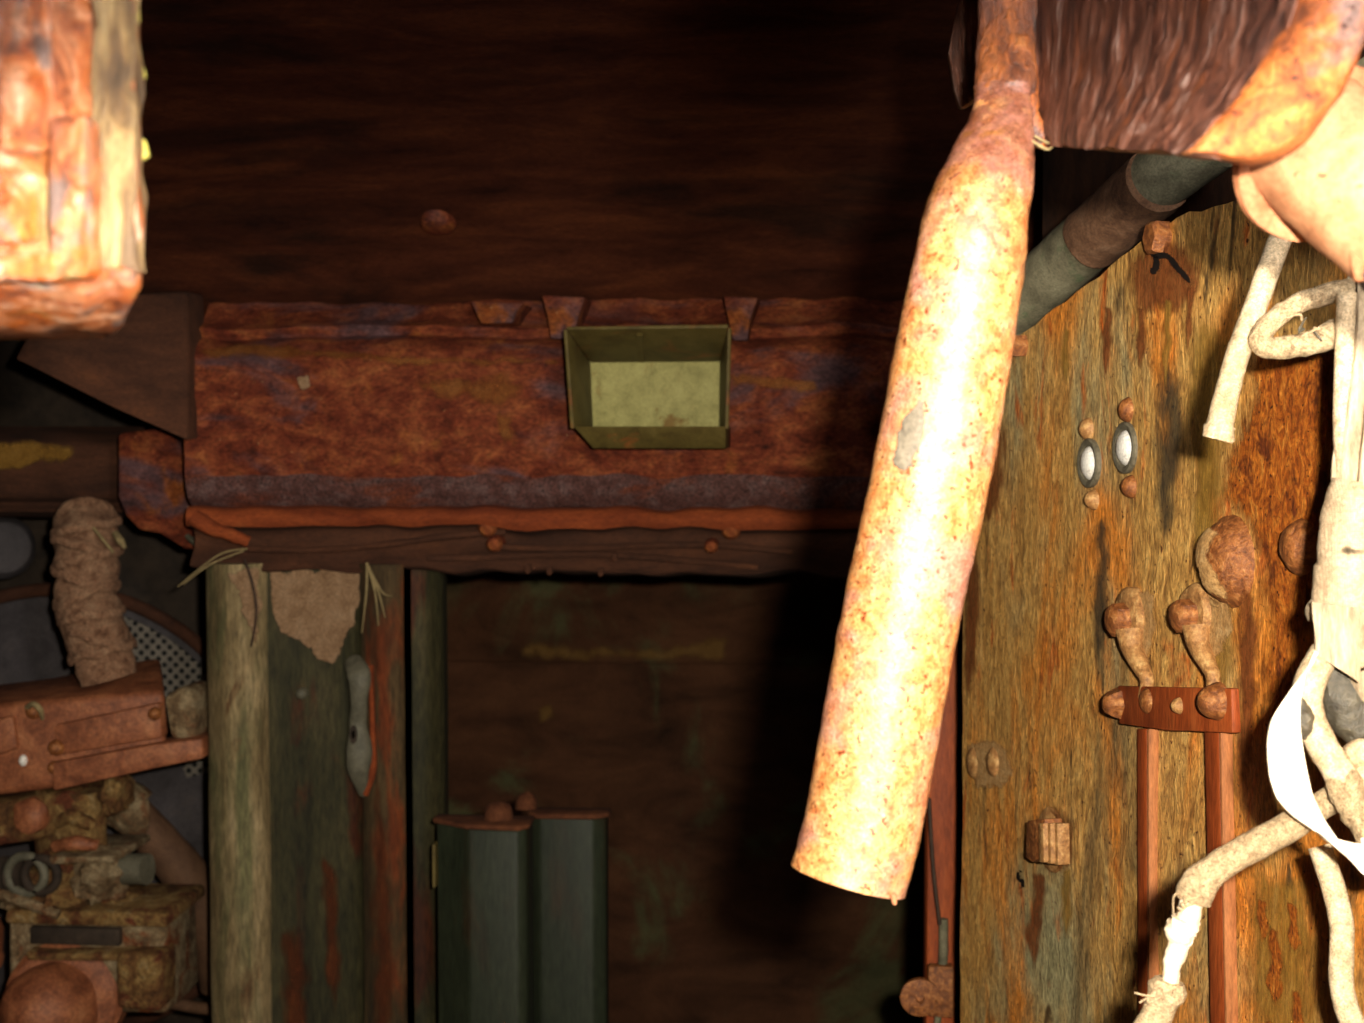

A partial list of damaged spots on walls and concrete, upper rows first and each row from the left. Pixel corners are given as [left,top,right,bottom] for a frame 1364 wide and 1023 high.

rust [1103,308,1112,370]
rust [983,431,1006,520]
rust [1131,242,1333,787]
peeling [227,567,360,663]
rust [965,557,979,691]
rust [1027,874,1045,961]
rust [1051,812,1072,928]